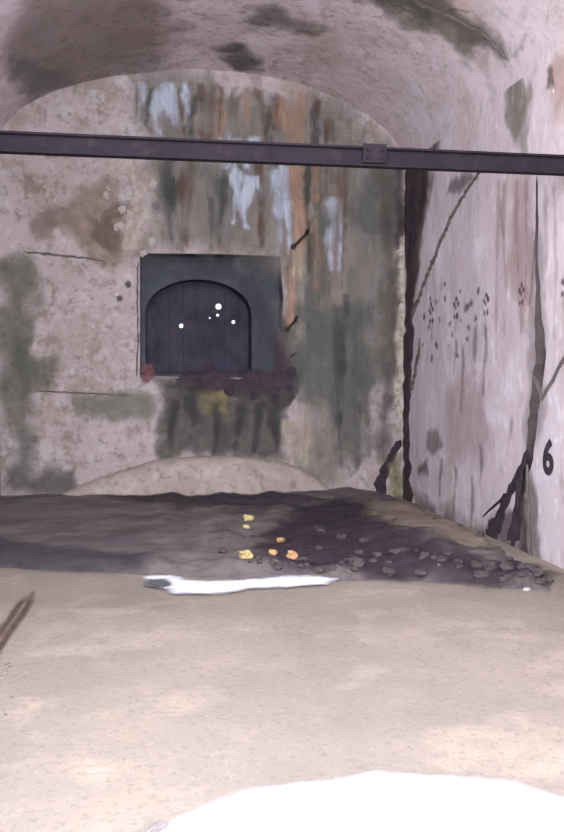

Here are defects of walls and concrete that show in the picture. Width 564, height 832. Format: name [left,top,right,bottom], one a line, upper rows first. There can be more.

water stain [222,43,258,70]
water stain [143,75,361,146]
water stain [252,8,293,25]
water stain [374,0,492,52]
water stain [0,260,73,494]
water stain [75,393,152,420]
water stain [157,160,429,476]
rust [287,166,318,327]
crack [373,170,480,502]
crack [482,175,564,555]